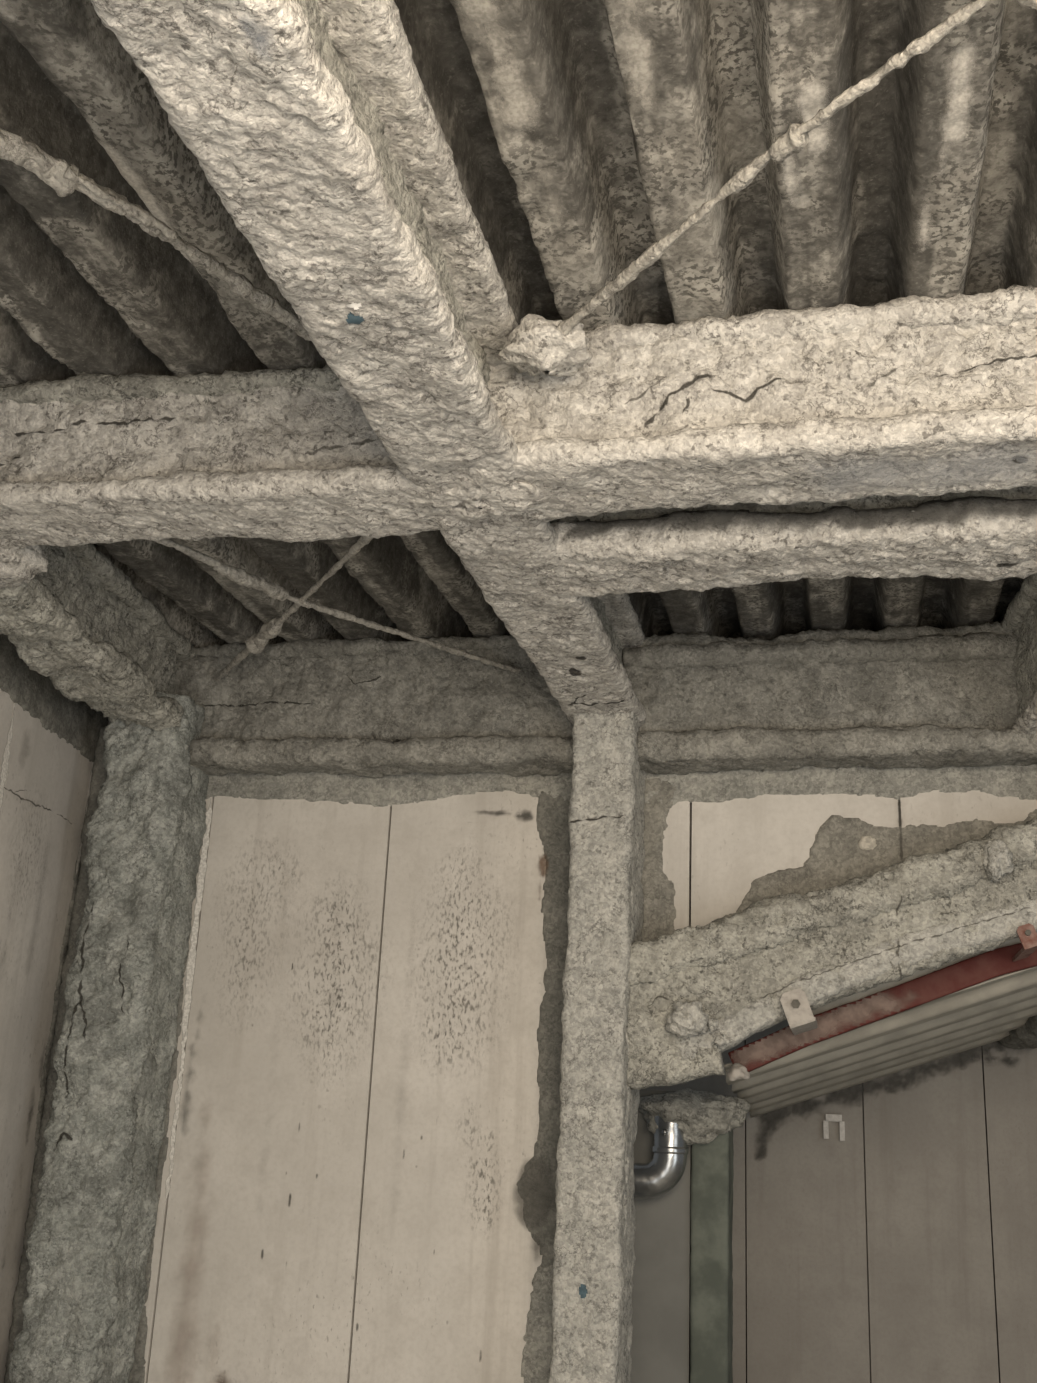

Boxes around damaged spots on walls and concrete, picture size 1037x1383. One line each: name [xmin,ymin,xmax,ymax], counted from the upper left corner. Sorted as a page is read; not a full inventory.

crack [627,374,781,426]
crack [64,902,94,1096]
crack [118,939,129,1013]
damp [439,897,478,1035]
crack [56,1132,72,1147]
damp [517,1163,551,1223]